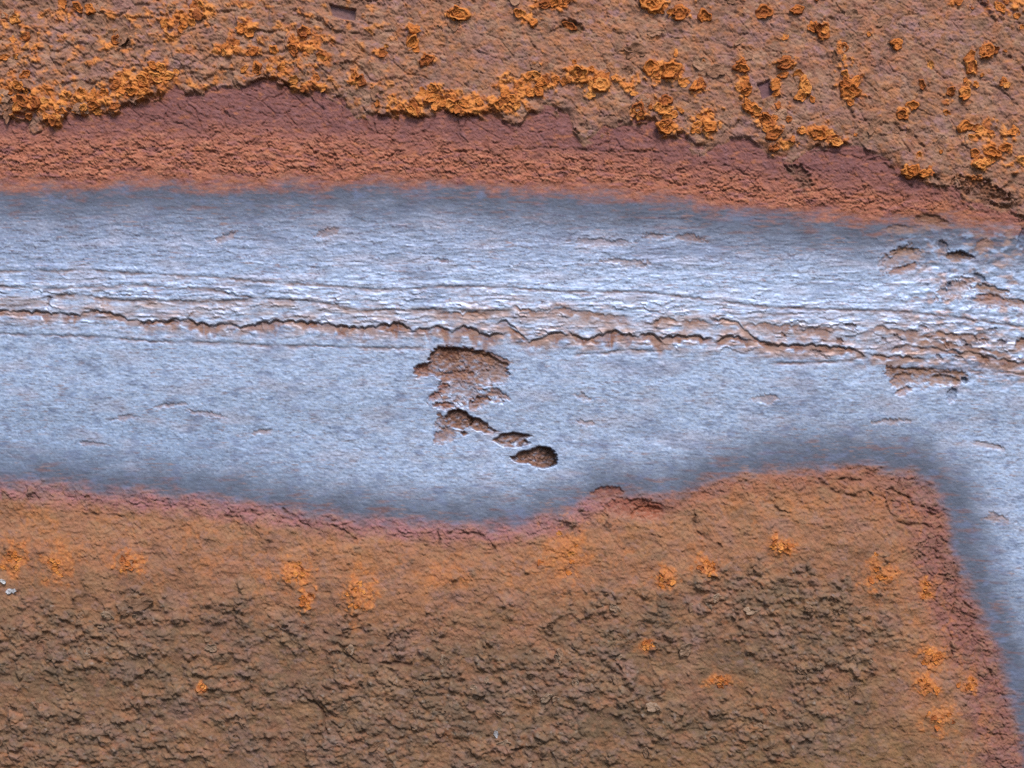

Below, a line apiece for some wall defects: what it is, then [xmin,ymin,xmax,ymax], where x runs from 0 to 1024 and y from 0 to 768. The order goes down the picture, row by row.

corrosion [0,0,1024,217]
spalling [878,173,1024,313]
spalling [413,345,559,469]
spalling [835,323,862,349]
spalling [883,325,1024,406]
corrosion [0,465,1024,768]